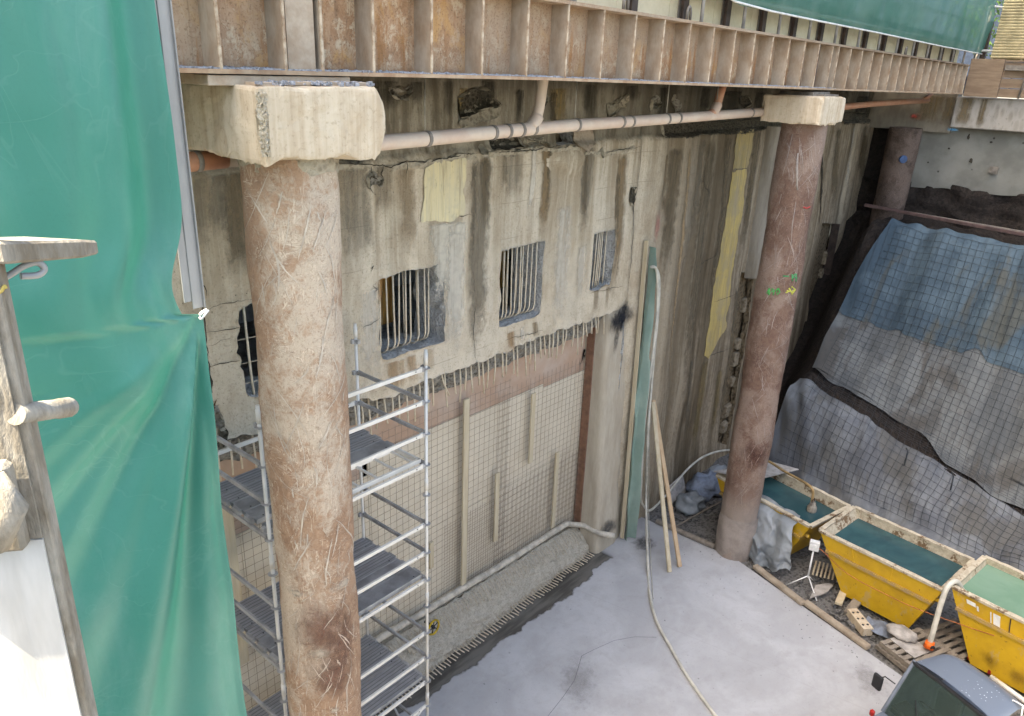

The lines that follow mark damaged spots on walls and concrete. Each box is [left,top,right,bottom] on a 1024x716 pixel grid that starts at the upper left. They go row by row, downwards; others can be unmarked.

spalling [255,92,272,157]
crack [350,145,561,192]
water stain [432,157,492,327]
spalling [458,87,502,128]
water stain [664,150,691,342]
peeling [649,94,767,359]
water stain [743,131,760,236]
crack [202,286,252,409]
spalling [349,316,603,426]
water stain [613,304,632,347]
spalling [214,405,264,462]